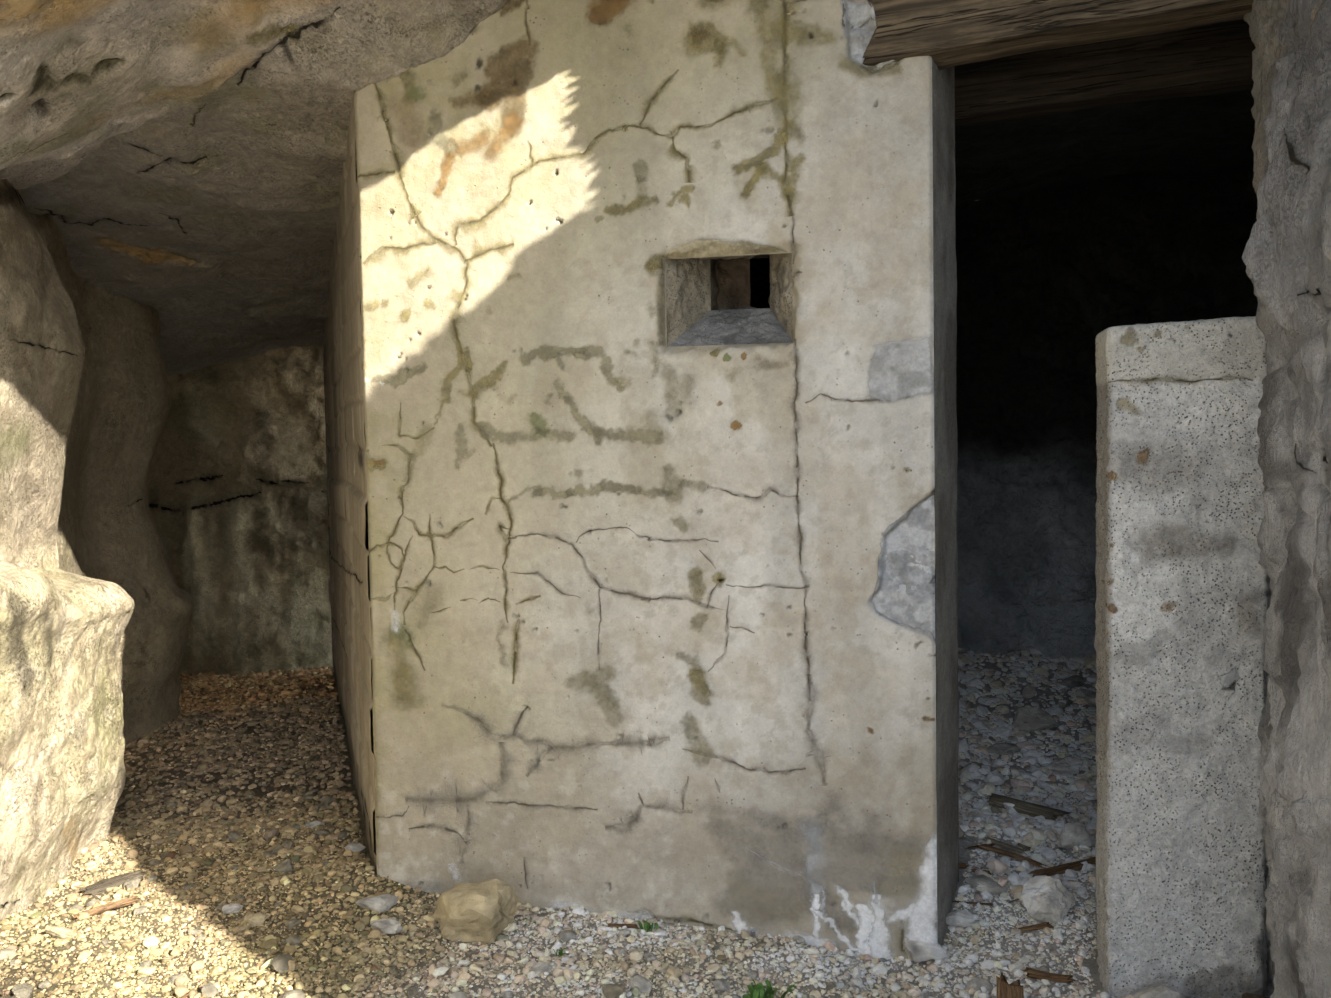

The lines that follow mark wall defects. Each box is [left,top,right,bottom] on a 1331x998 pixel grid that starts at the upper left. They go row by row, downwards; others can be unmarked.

flaking render [840,0,900,74]
crack [331,0,920,852]
peeling [869,338,933,401]
crack [1108,375,1253,383]
flaking render [872,495,935,640]
damp [712,805,937,958]